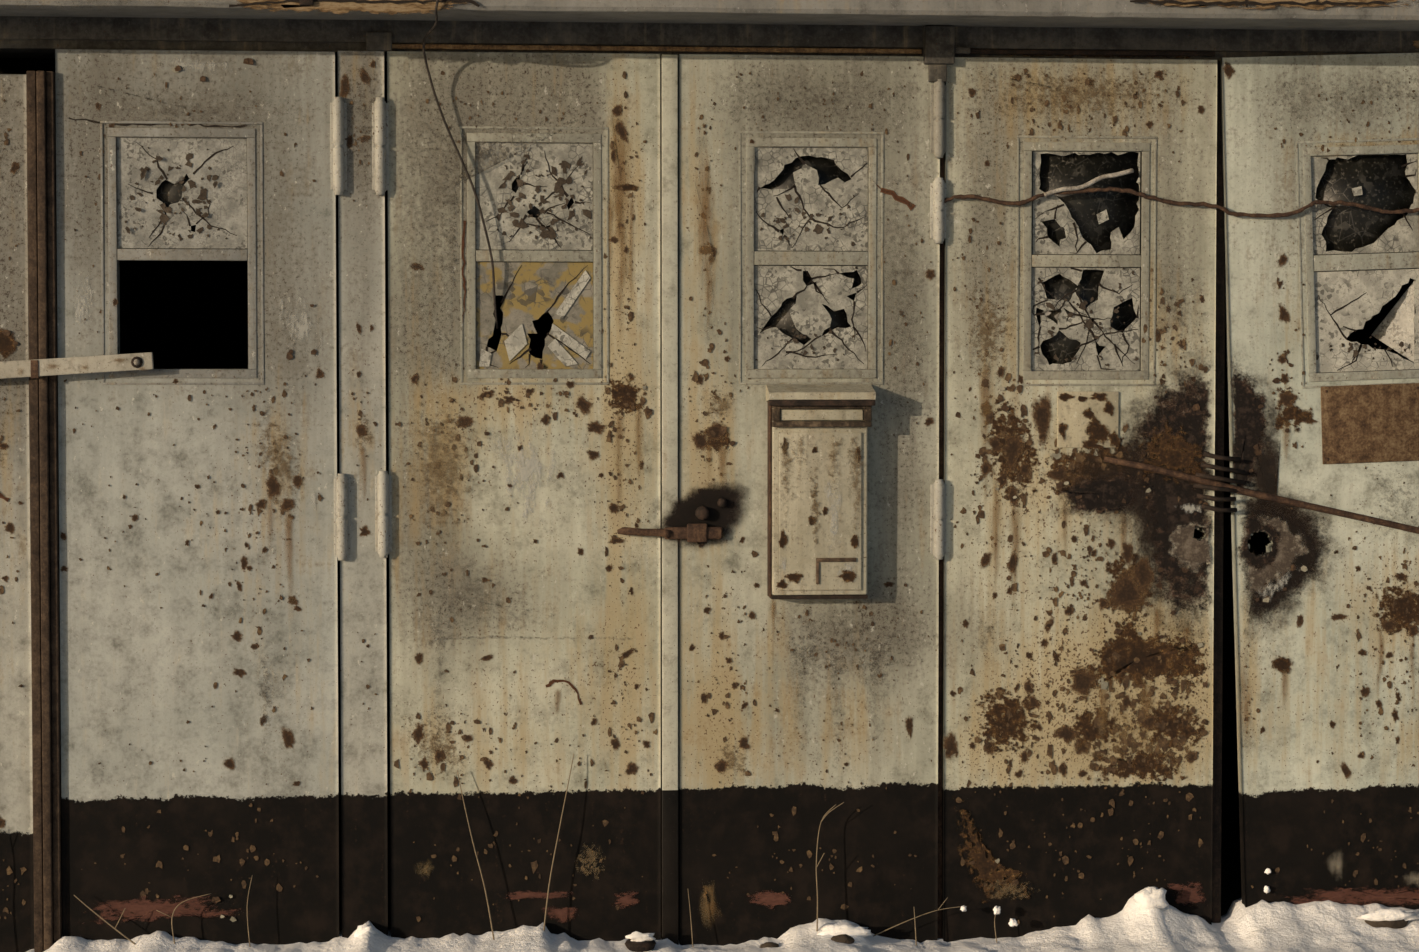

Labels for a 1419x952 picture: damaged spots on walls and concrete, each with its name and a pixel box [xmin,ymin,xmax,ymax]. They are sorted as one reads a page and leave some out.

peeling [229,0,480,15]
peeling [1130,0,1419,10]